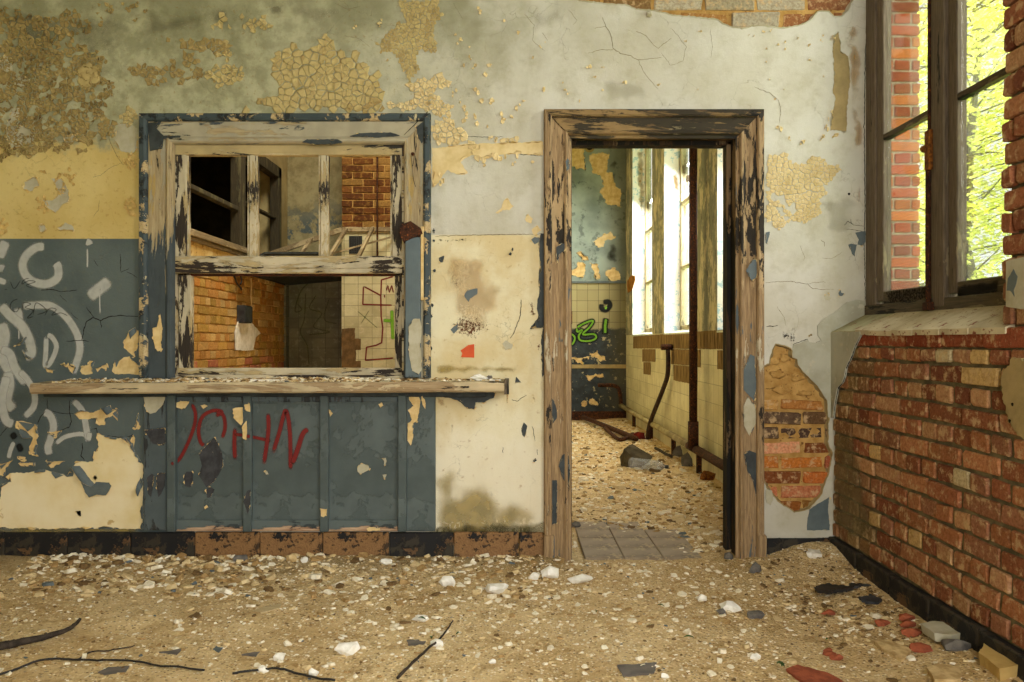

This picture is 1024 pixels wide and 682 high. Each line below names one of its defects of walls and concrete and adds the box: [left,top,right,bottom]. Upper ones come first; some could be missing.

peeling [0,1,180,171]
peeling [127,12,274,89]
peeling [241,0,543,187]
crack [572,14,713,89]
flaking render [578,0,854,141]
peeling [566,149,622,208]
peeling [594,232,616,248]
peeling [764,125,841,244]
peeling [0,397,208,530]
leakage [431,493,544,533]
flaking render [743,344,833,513]